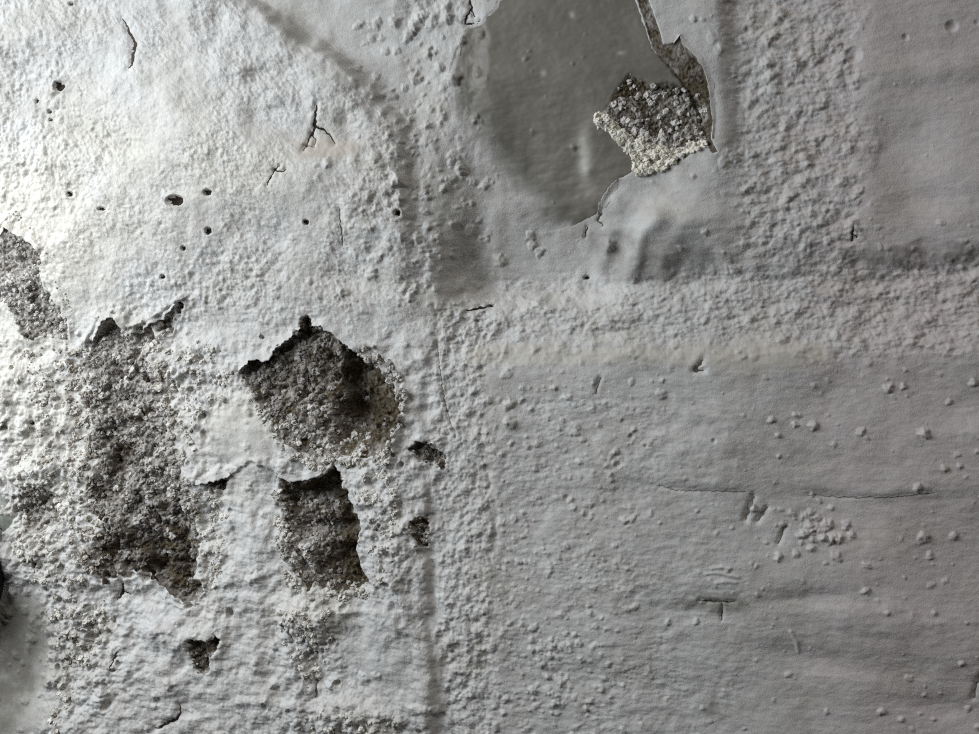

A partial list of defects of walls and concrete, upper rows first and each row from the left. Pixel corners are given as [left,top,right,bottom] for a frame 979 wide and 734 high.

crack [122,19,137,69]
crack [303,105,335,151]
peeling [454,0,717,225]
spalling [0,220,231,608]
spalling [238,316,408,603]
spalling [188,635,221,676]